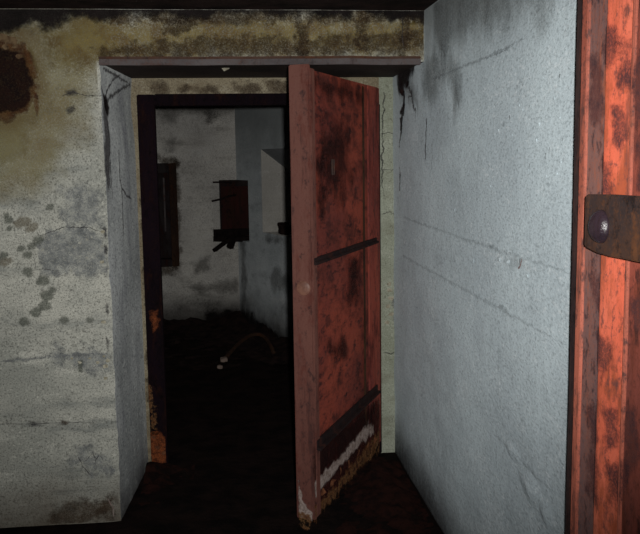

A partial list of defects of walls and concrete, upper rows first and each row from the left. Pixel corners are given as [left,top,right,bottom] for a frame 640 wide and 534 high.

rust [0,33,38,123]
damp [0,9,424,191]
crack [381,75,427,194]
damp [5,213,43,258]
damp [20,276,55,325]
rust [147,379,166,463]